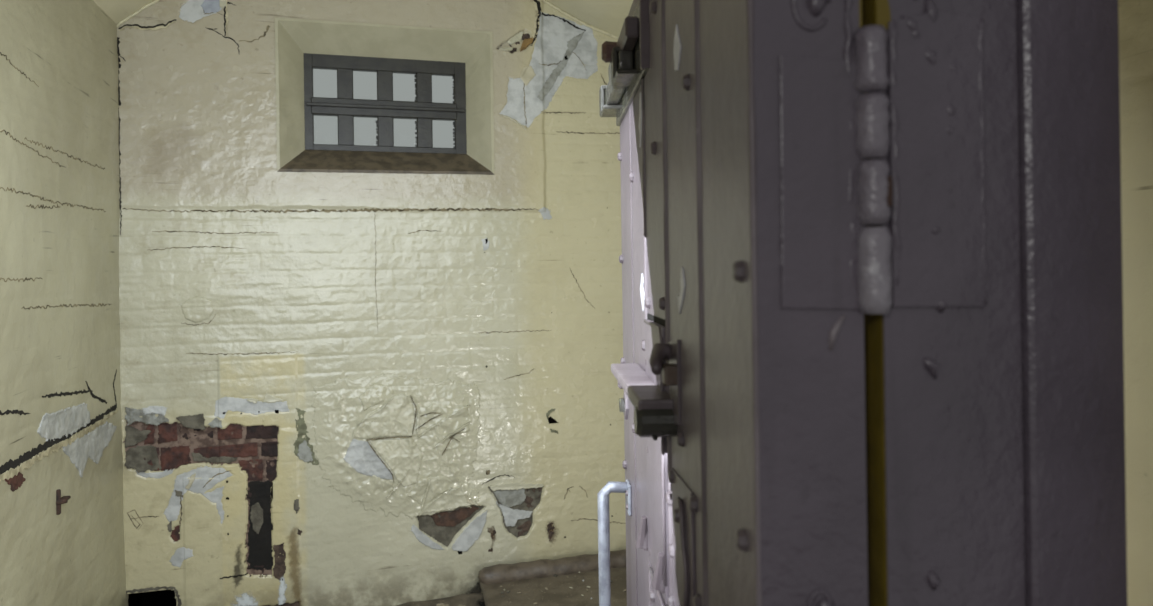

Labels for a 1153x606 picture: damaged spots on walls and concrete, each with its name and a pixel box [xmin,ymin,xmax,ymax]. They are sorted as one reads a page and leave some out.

peeling [179,0,226,23]
crack [205,0,270,50]
crack [528,0,586,47]
peeling [497,11,611,130]
crack [541,111,620,134]
crack [0,19,537,328]
crack [0,369,118,492]
flaking render [123,392,289,581]
flaking render [411,483,543,554]